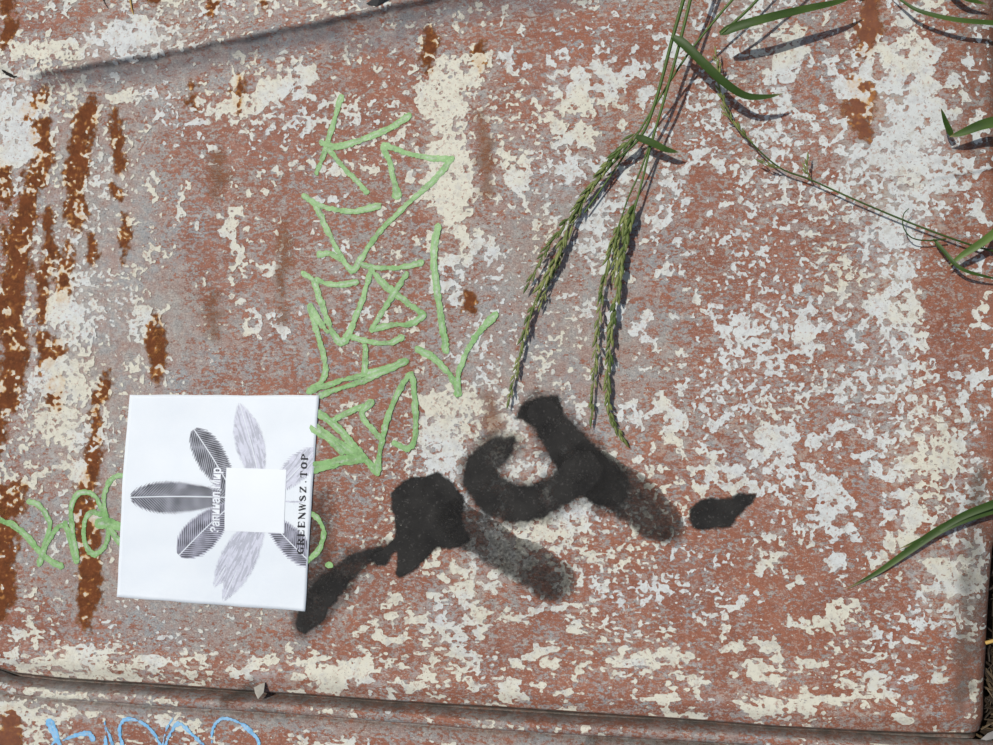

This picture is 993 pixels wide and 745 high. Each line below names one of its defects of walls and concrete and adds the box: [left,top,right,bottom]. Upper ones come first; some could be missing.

corrosion [841,75,878,144]
corrosion [0,84,133,453]
corrosion [143,313,168,384]
peeling [0,0,690,564]
peeling [601,0,993,592]
corrosion [0,478,29,621]
corrosion [73,368,112,631]
peeling [0,495,990,727]
corrosion [0,709,23,745]
peeling [0,682,272,745]
peeling [287,729,370,745]
peeling [476,720,524,730]